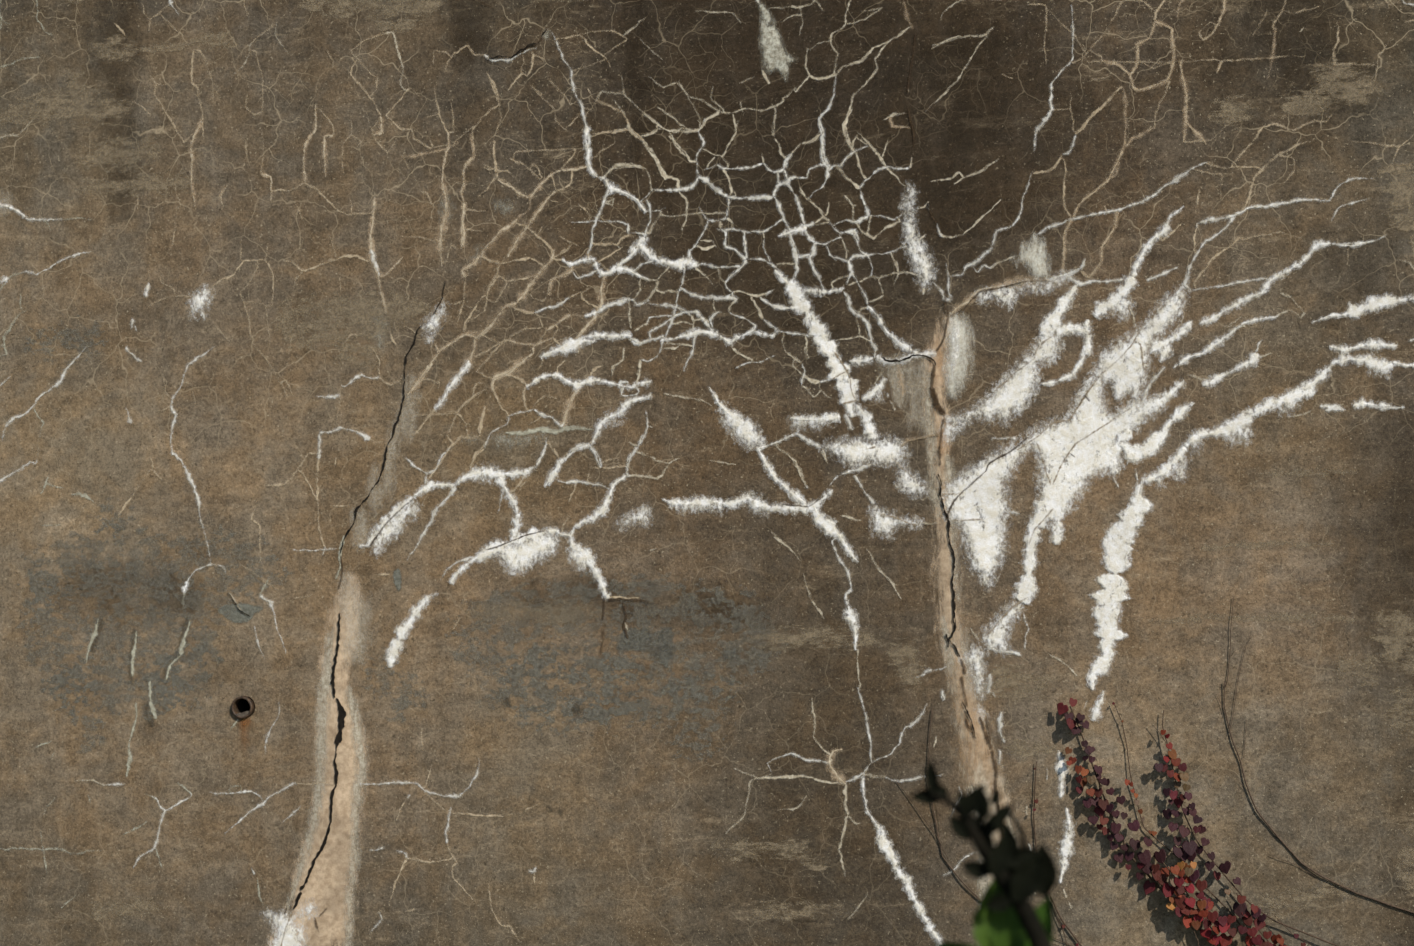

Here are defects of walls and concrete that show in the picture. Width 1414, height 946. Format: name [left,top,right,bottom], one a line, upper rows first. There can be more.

efflorescence [757,0,793,84]
crack [160,173,402,301]
efflorescence [900,188,936,295]
crack [1128,123,1414,527]
efflorescence [1313,294,1414,323]
efflorescence [1329,339,1414,355]
crack [251,513,283,646]
efflorescence [702,387,765,447]
crack [269,0,1208,942]
water stain [775,267,1193,763]
crack [126,613,346,929]
efflorescence [1055,752,1073,898]